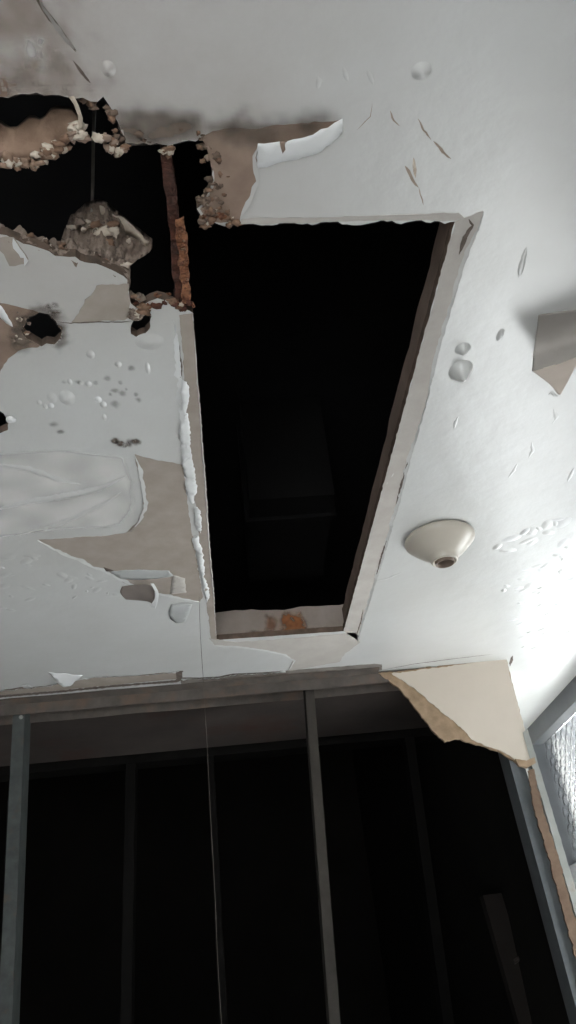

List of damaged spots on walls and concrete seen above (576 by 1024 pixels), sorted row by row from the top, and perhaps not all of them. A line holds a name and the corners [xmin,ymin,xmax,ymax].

spalling [78,98,146,158]
corrosion [157,145,176,159]
crack [357,108,451,159]
crack [405,158,423,203]
corrosion [133,229,195,308]
peeling [532,310,576,395]
peeling [0,119,490,698]
corrosion [253,613,306,632]